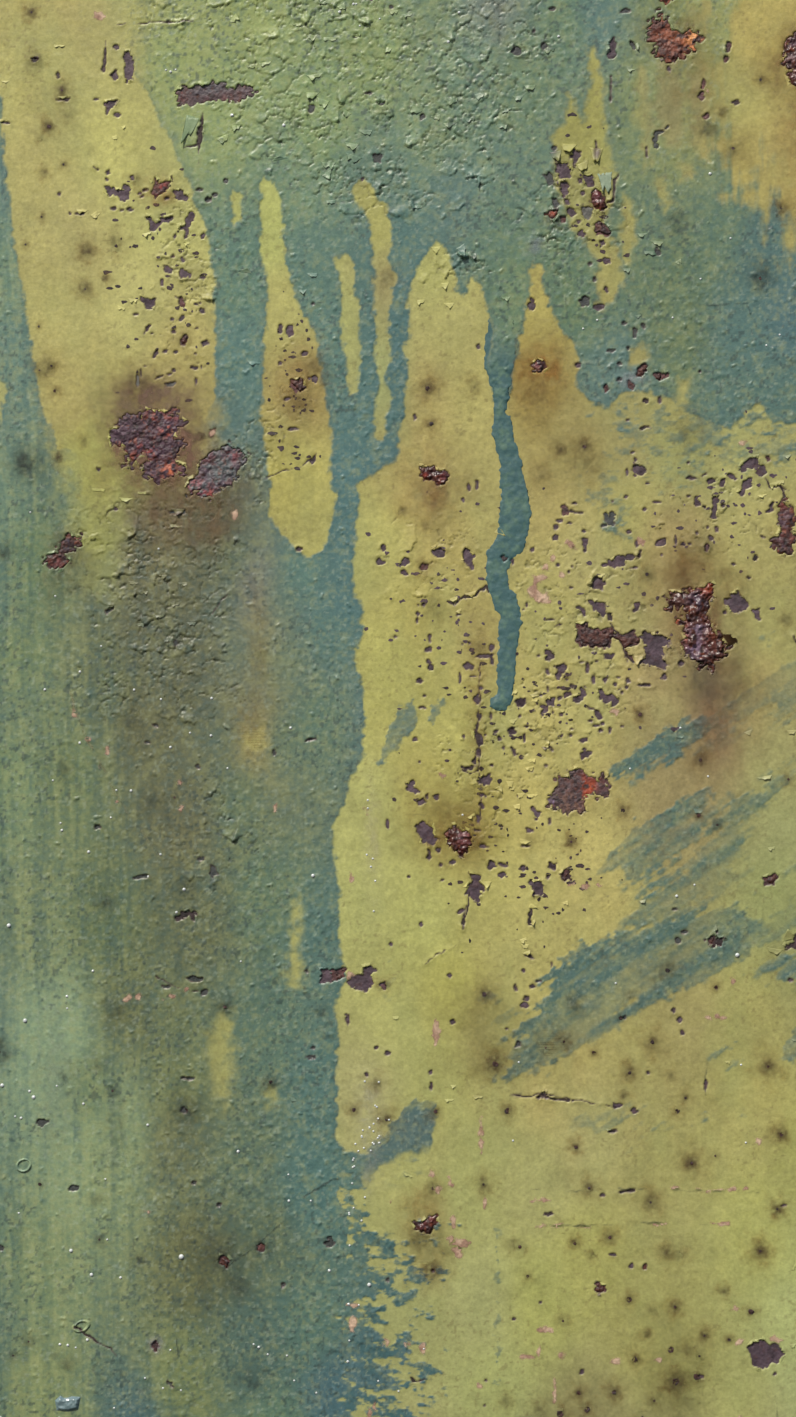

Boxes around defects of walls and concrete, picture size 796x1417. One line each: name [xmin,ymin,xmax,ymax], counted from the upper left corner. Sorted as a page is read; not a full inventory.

rust [645,0,705,63]
peeling [102,45,134,84]
peeling [544,112,682,311]
peeling [69,169,228,402]
rust [107,385,249,537]
rust [770,493,796,558]
rust [663,556,733,676]
peeling [365,447,796,1008]
rust [546,766,611,816]
rust [444,821,481,860]
peeling [306,963,386,992]
peeling [747,1336,786,1375]